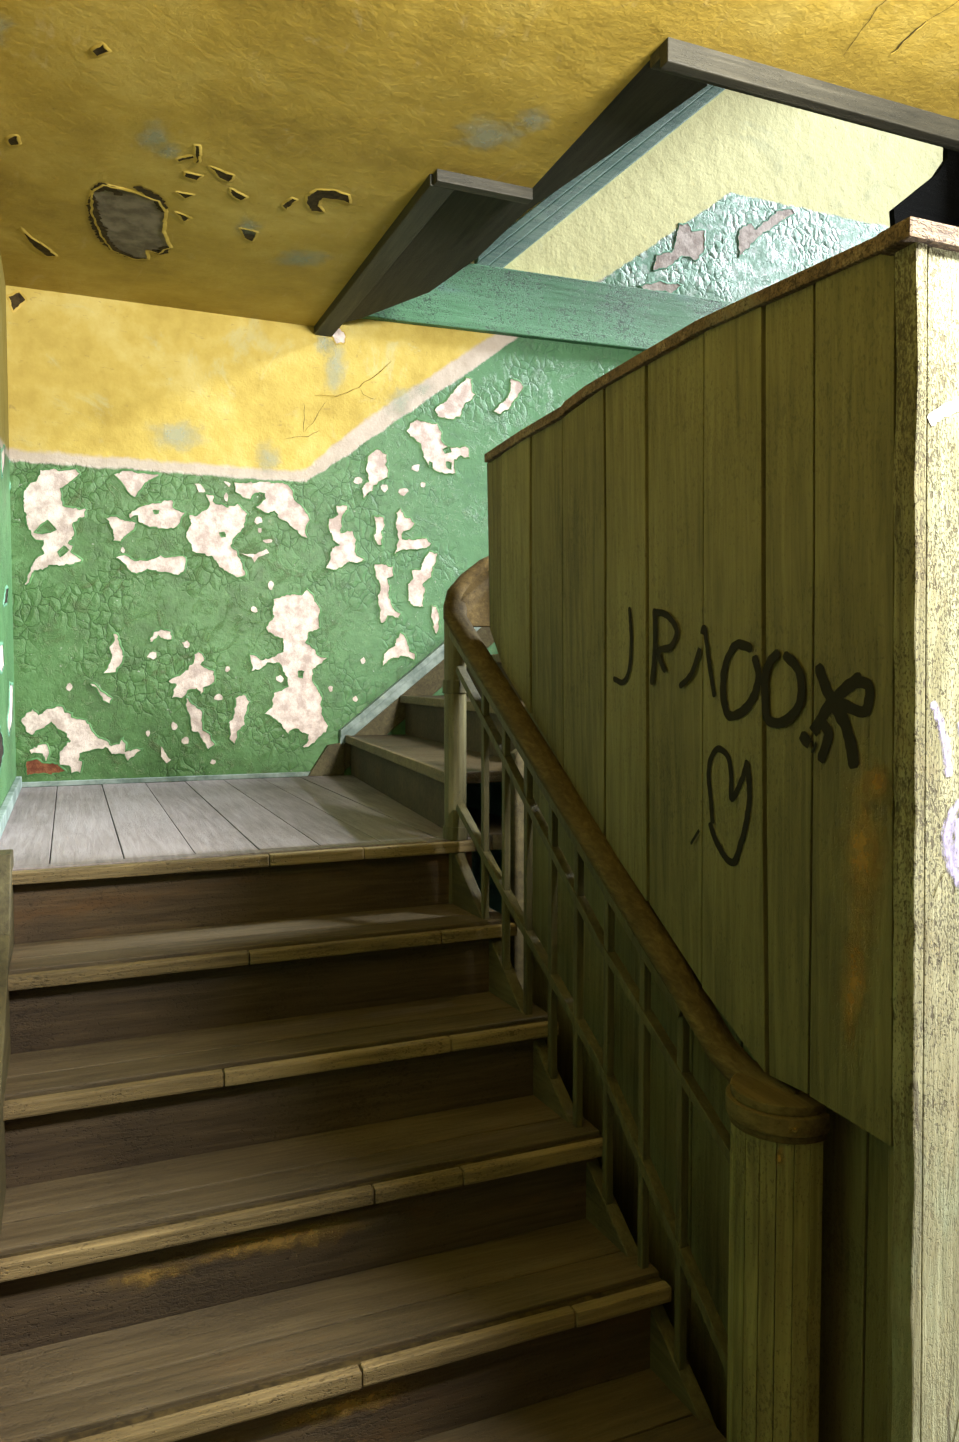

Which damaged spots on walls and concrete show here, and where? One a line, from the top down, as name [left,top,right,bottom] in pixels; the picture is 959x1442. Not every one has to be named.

crack [891,0,959,54]
flaking render [86,143,249,260]
peeling [238,227,259,242]
peeling [280,188,352,213]
peeling [639,222,706,293]
peeling [737,207,796,258]
peeling [492,378,524,415]
peeling [1,444,88,607]
peeling [105,377,477,667]
peeling [0,632,150,777]
peeling [147,581,333,764]